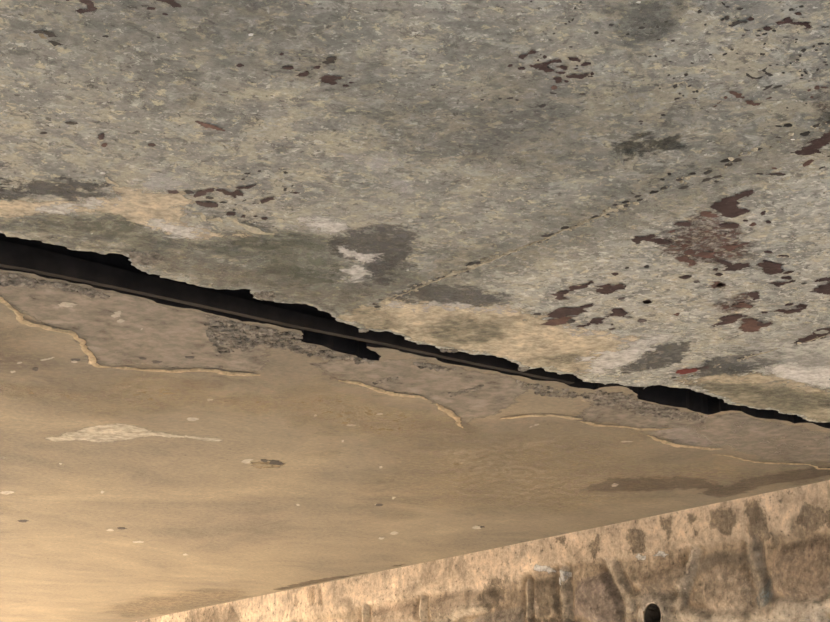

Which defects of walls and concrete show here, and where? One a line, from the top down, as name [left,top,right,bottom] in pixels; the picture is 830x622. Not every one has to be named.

corrosion [661,215,755,264]
spalling [252,291,276,301]
crack [0,297,259,376]
spalling [204,315,374,365]
crack [339,380,463,428]
crack [500,414,830,470]